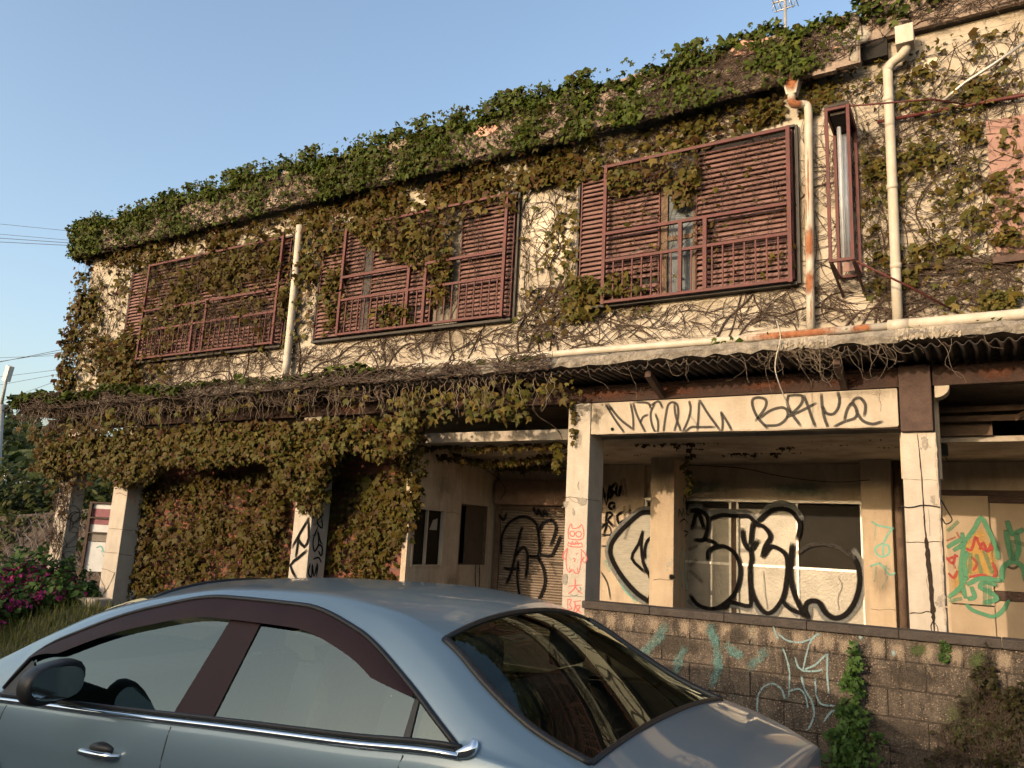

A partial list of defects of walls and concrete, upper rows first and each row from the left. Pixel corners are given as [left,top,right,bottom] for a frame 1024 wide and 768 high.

corrosion [785,75,802,108]
corrosion [805,229,813,255]
corrosion [806,272,814,315]
corrosion [753,328,835,339]
crack [873,434,940,631]